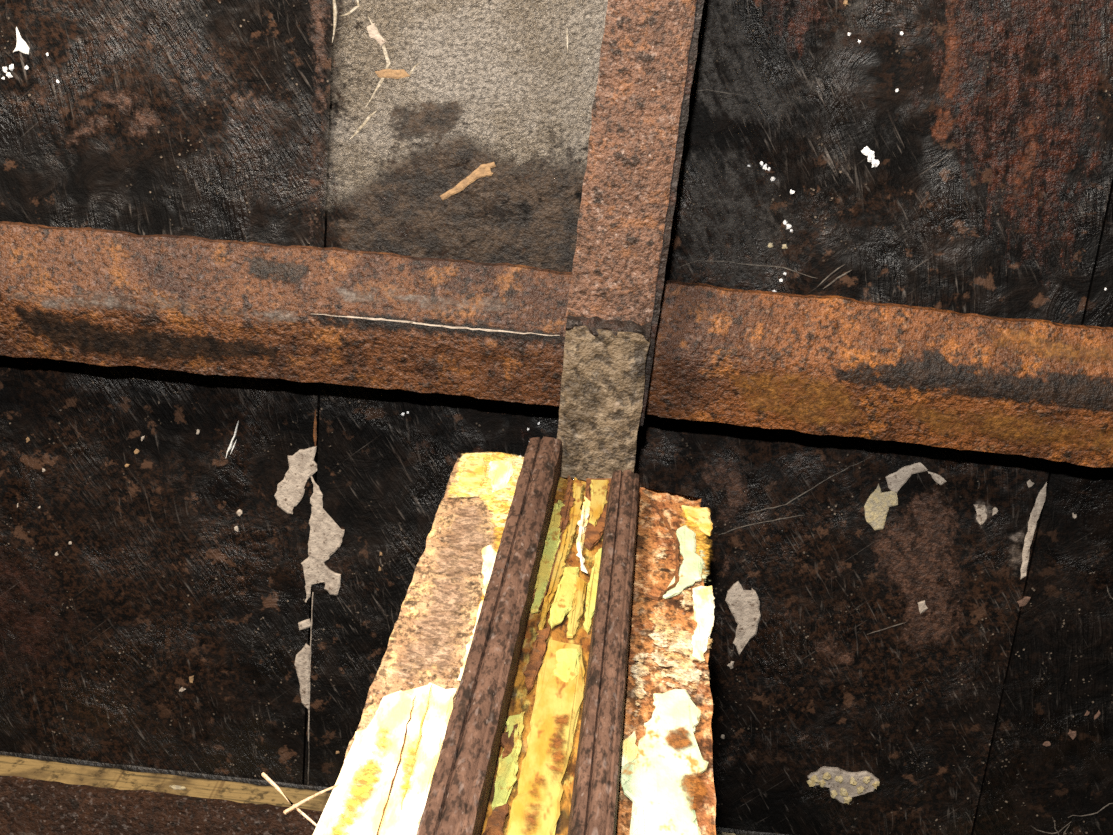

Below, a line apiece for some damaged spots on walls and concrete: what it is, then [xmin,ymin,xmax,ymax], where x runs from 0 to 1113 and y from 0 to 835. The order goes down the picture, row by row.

rust [14,305,289,363]
rust [249,256,308,283]
water stain [334,95,588,272]
rust [735,350,1113,449]
peeling [274,409,345,785]
peeling [313,448,524,835]
peeling [620,500,761,835]
spalling [864,462,962,650]
peeling [1011,479,1047,579]